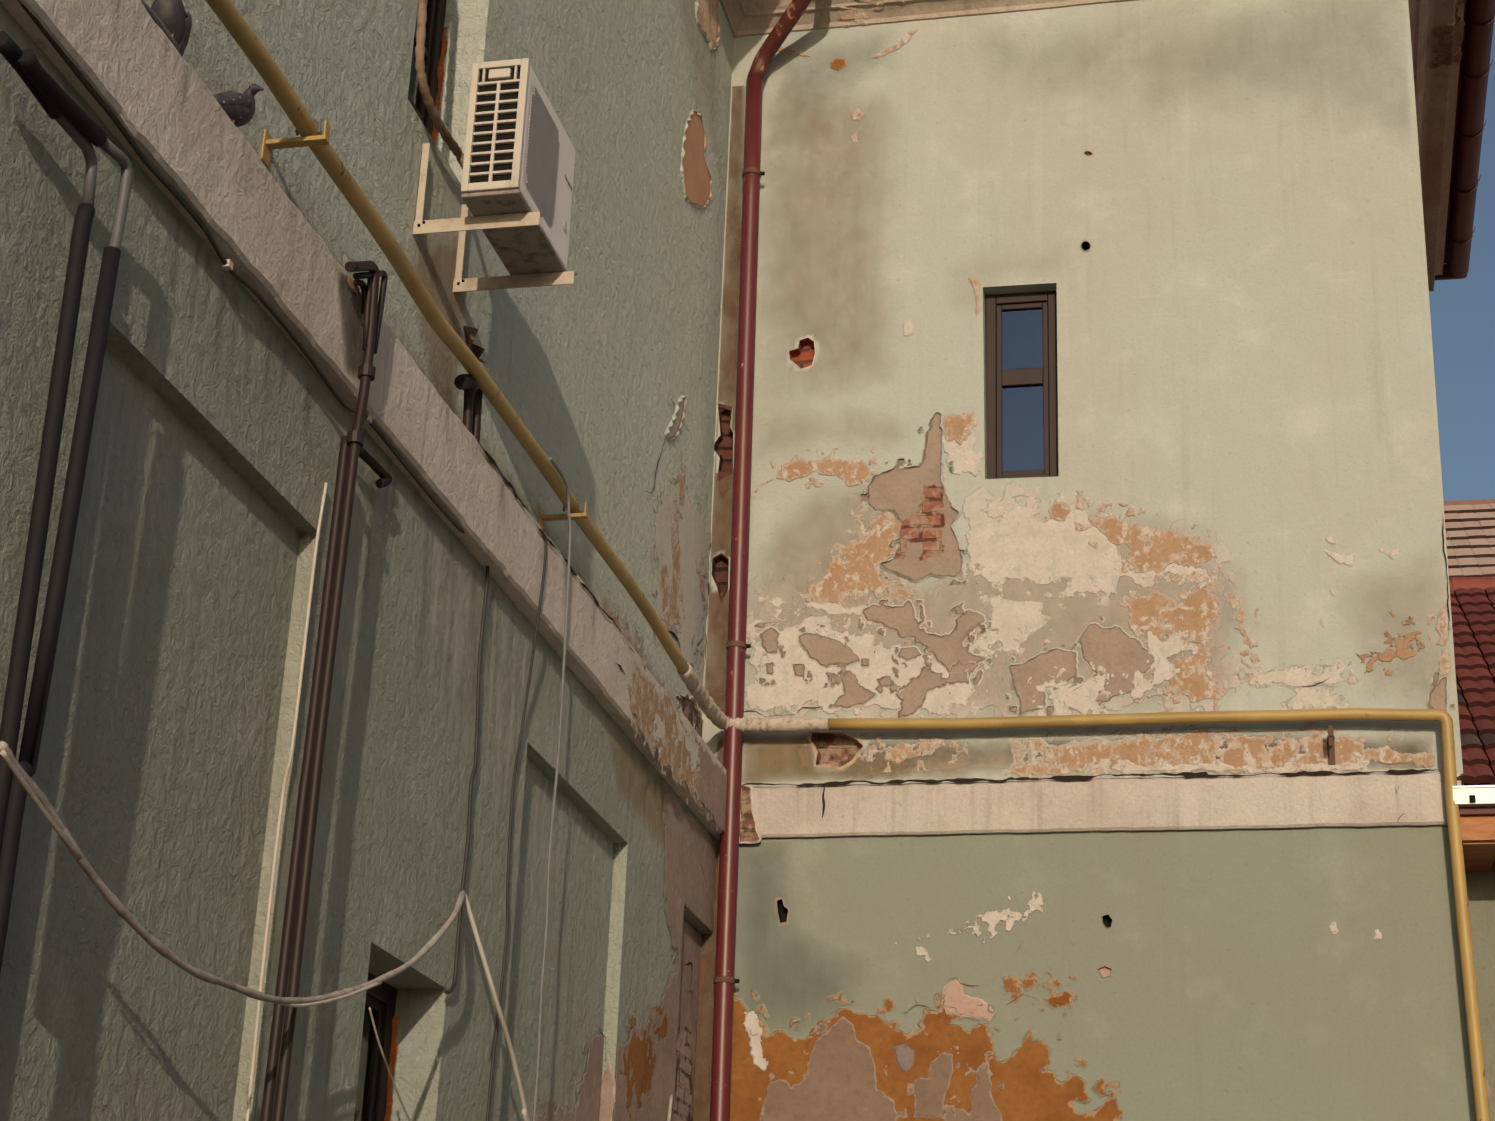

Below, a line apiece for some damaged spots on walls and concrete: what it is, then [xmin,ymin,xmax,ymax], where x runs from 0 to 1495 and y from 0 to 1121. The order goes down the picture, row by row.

peeling [828,0,906,27]
spalling [680,109,712,210]
spalling [787,335,816,370]
peeling [748,411,1435,779]
spalling [1349,602,1456,713]
spalling [536,395,762,1121]
spalling [775,897,790,926]
peeling [915,920,985,962]
peeling [1007,891,1044,922]
spalling [1101,913,1113,929]
spalling [1096,965,1112,978]
peeling [730,971,1123,1121]